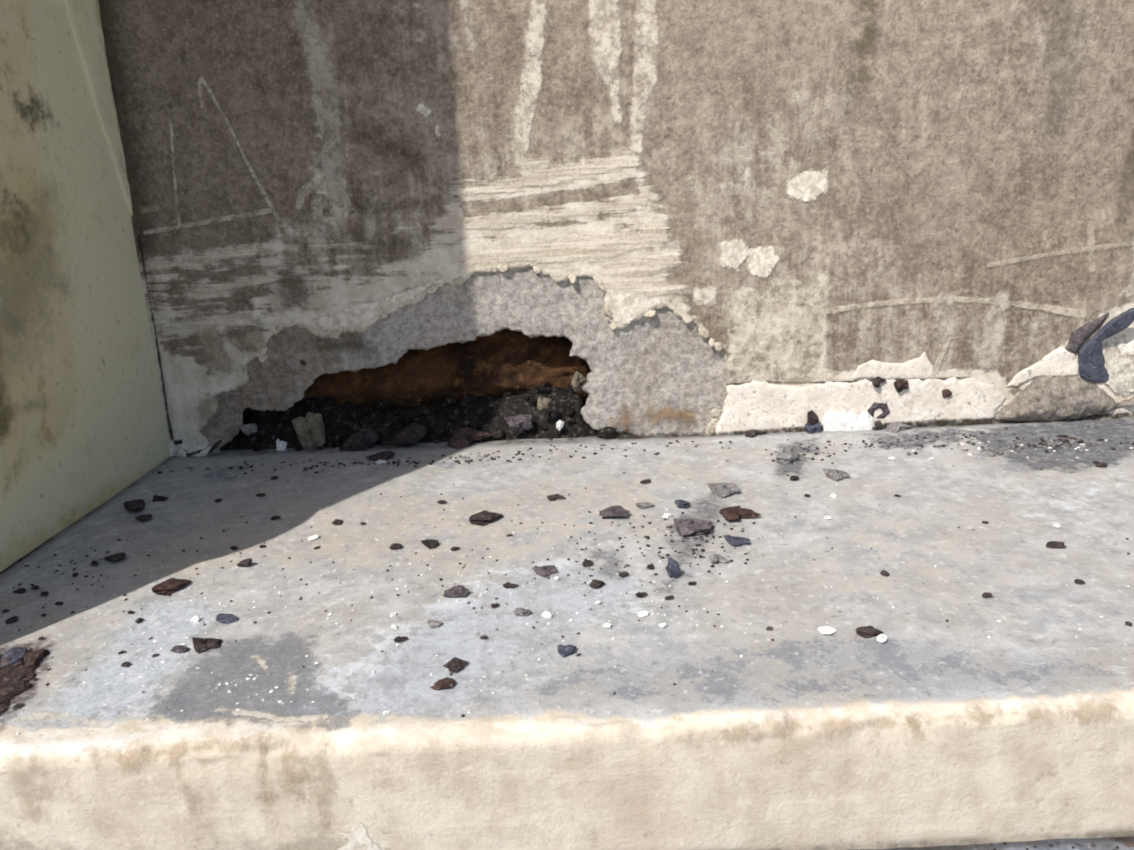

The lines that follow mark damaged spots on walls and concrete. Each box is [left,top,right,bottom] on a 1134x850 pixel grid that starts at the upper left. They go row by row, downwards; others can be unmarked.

peeling [455,151,642,200]
peeling [464,195,650,229]
flaking render [151,223,1134,457]
leakage [215,709,328,723]